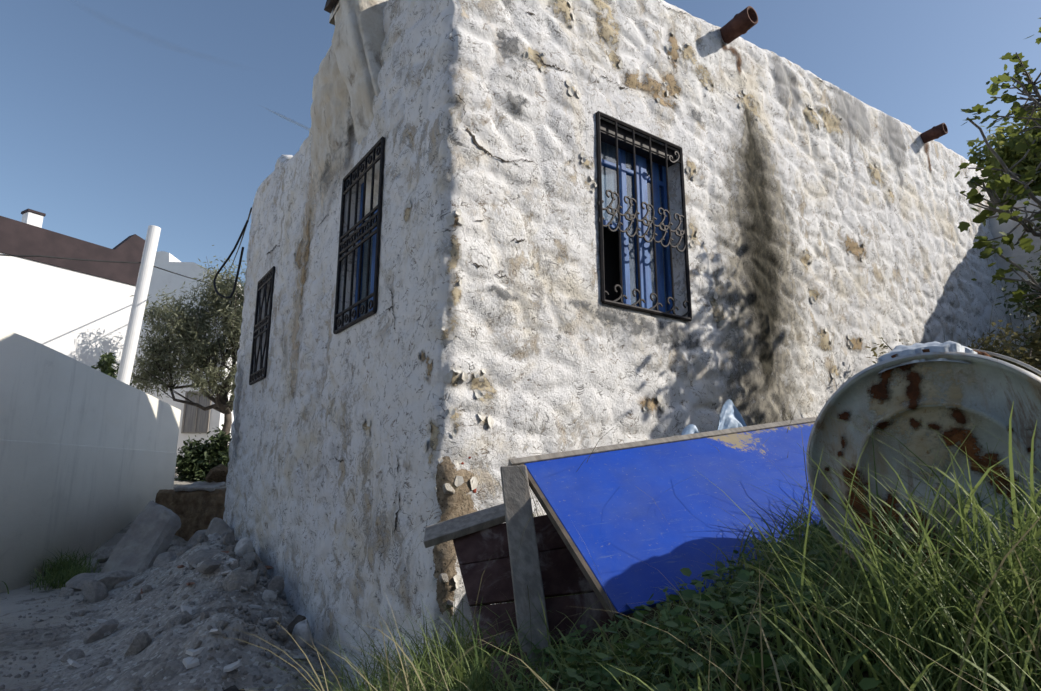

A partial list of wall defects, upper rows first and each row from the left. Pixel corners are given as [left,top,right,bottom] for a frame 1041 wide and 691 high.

crack [456,94,540,167]
rust [722,42,742,75]
water stain [774,54,800,123]
water stain [834,88,870,159]
water stain [883,114,905,186]
water stain [715,106,805,426]
peeling [449,407,463,436]
spalling [423,420,478,523]
spalling [433,540,460,620]